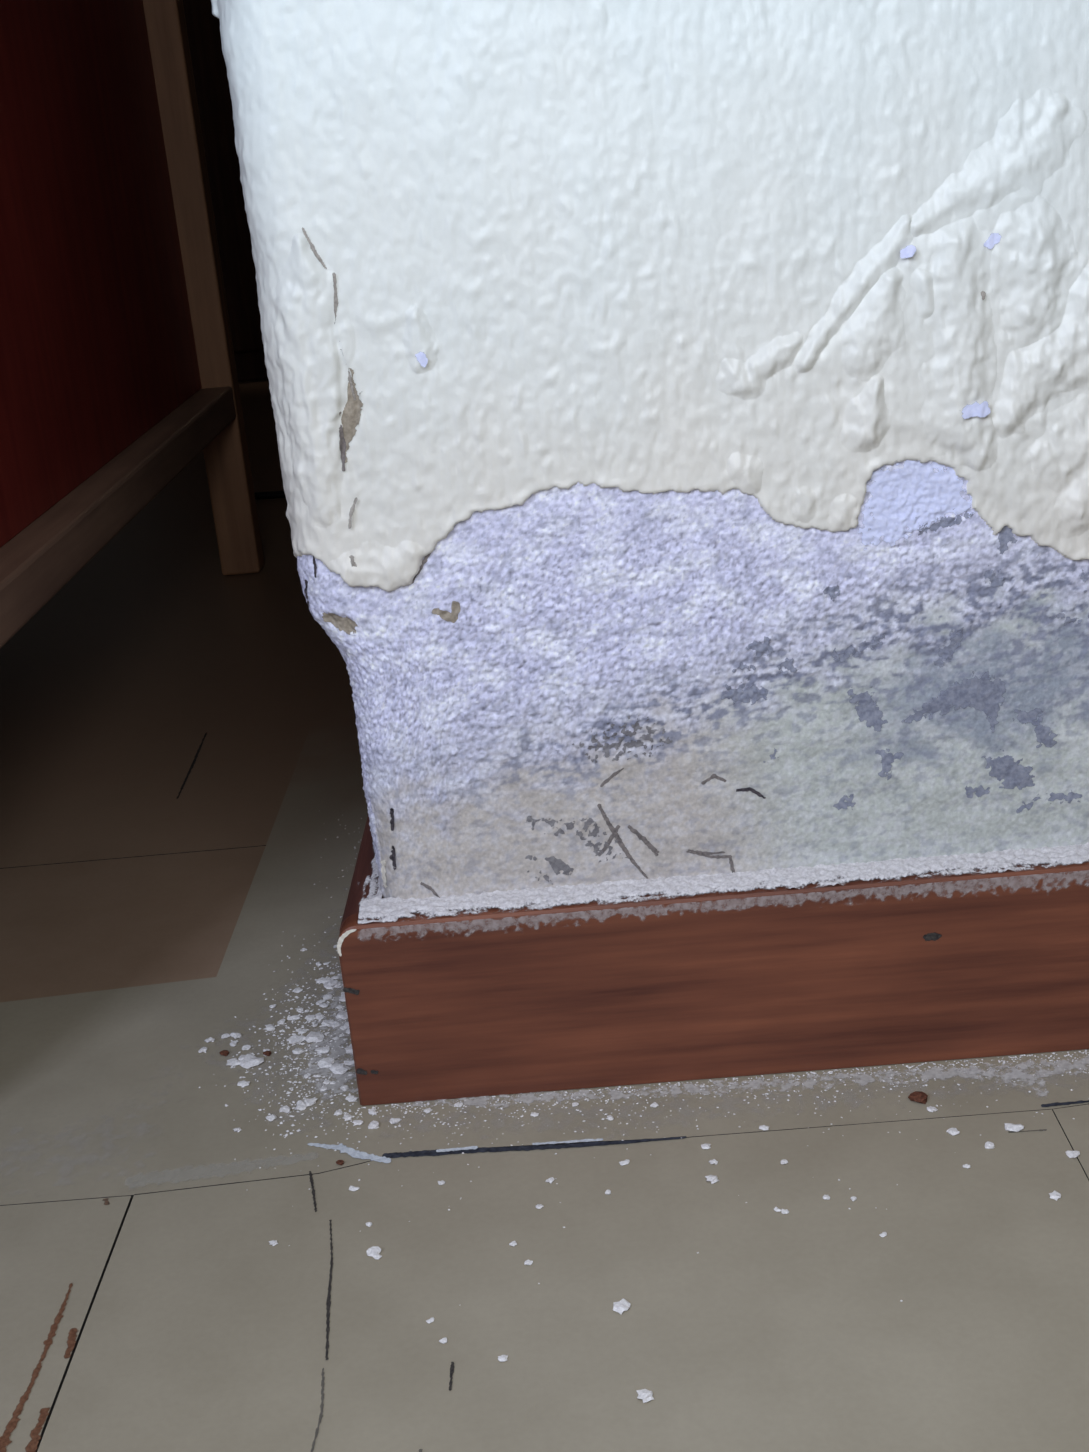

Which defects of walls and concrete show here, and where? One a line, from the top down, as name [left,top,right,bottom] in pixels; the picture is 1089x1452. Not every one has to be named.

spalling [297,460,1089,899]